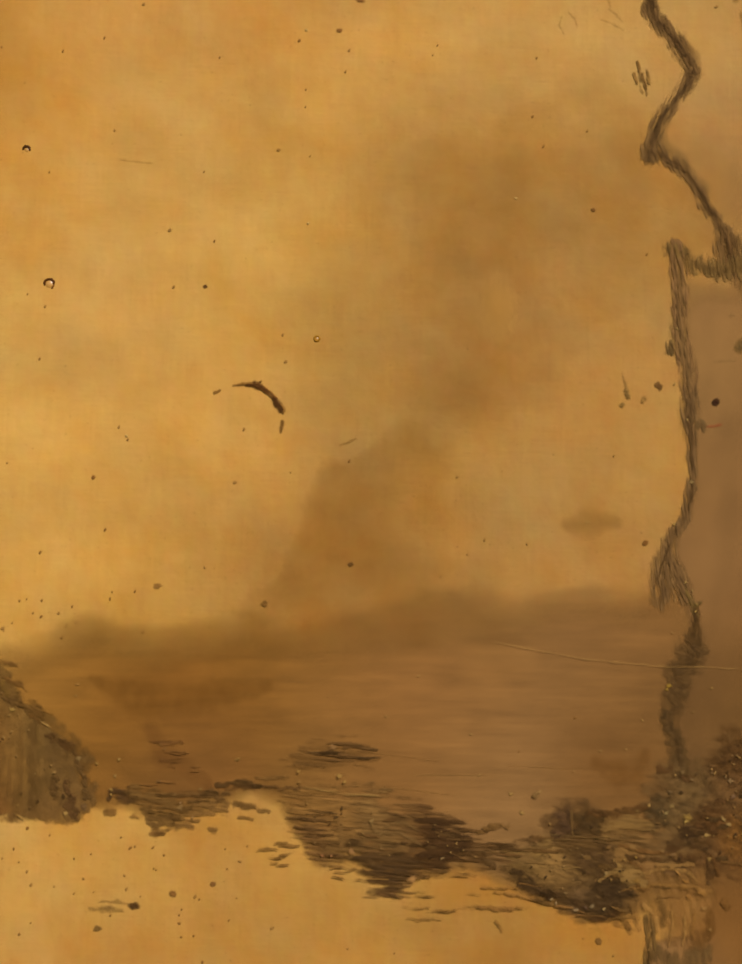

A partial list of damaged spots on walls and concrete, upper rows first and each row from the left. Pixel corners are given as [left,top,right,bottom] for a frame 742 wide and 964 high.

peeling [0,660,98,829]
leakage [6,296,742,964]
crack [643,915,713,964]
crack [640,0,742,803]